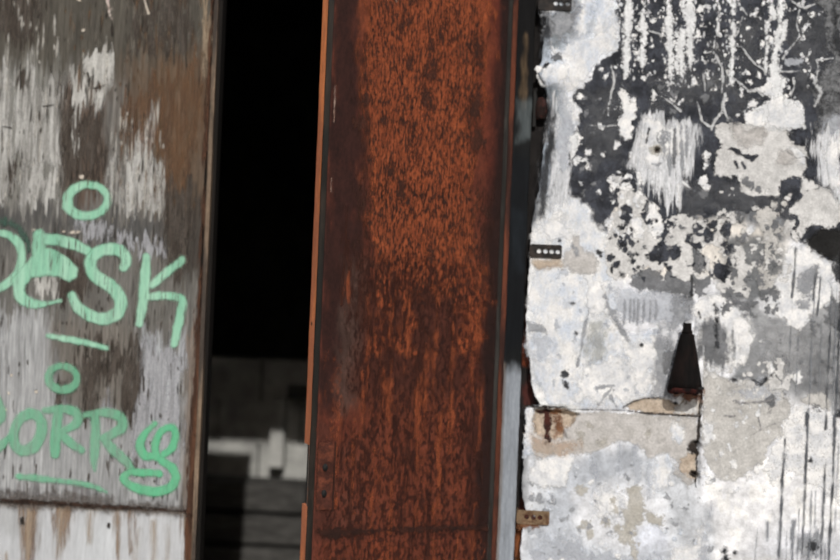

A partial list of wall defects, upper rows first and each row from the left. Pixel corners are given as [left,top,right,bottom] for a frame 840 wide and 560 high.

peeling [34,247,90,311]
peeling [0,0,197,285]
rust [323,0,500,560]
crack [523,395,703,487]
peeling [522,0,840,560]
damp [766,274,840,560]
damp [831,262,840,284]